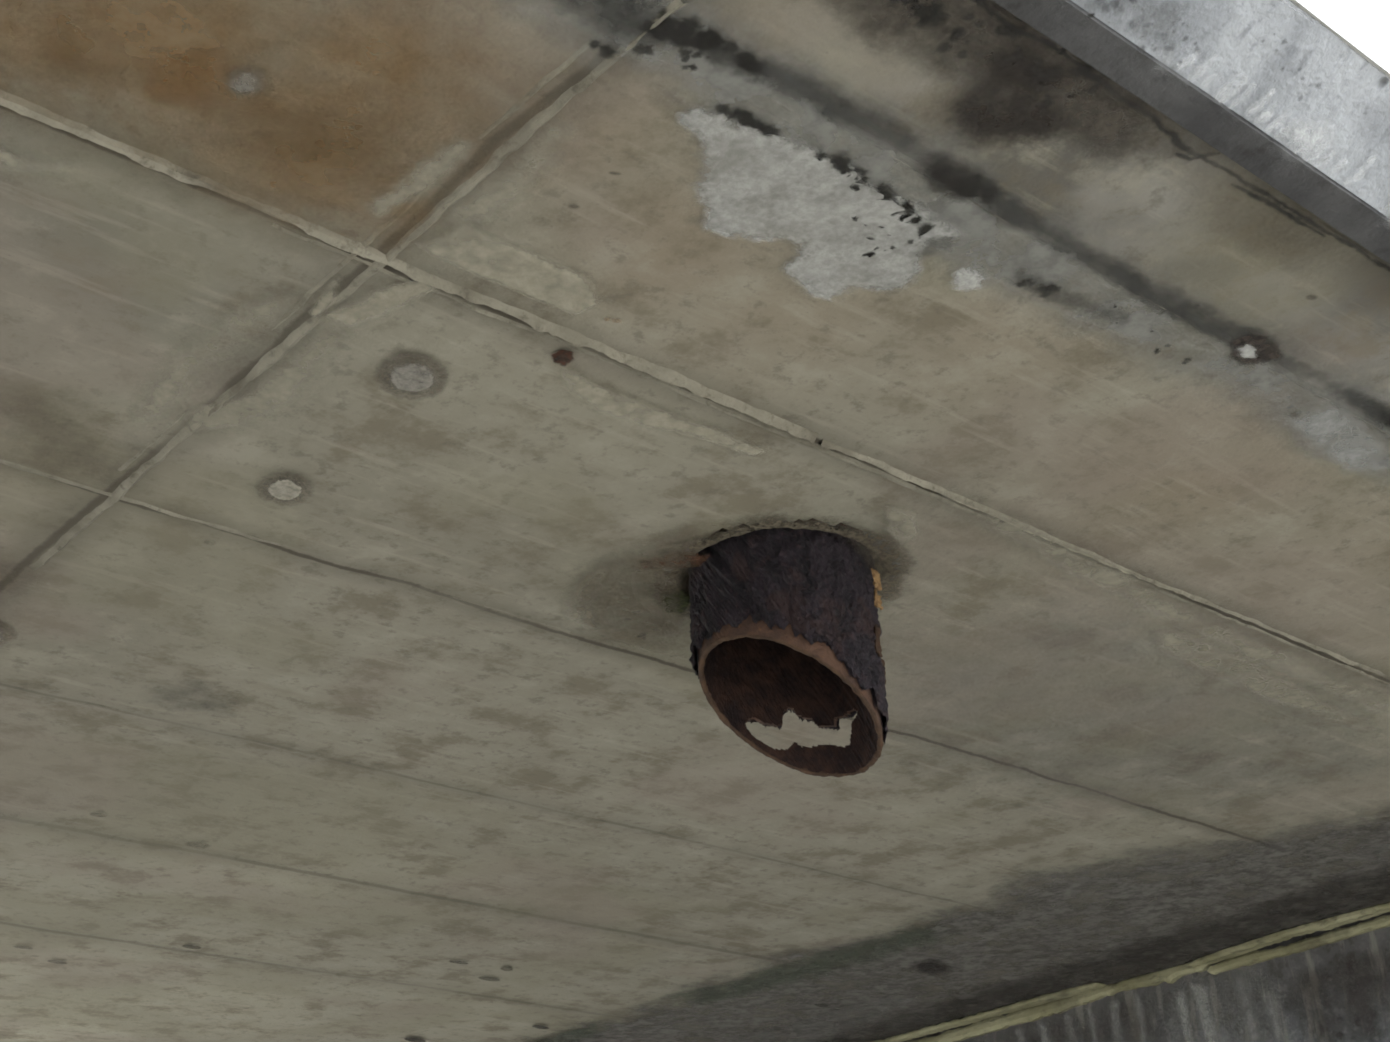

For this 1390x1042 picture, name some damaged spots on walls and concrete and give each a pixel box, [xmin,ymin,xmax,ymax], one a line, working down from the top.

peeling [681,109,961,298]
damp [565,0,1272,354]
damp [1182,356,1390,470]
rust [870,568,887,684]
damp [537,814,1390,1042]